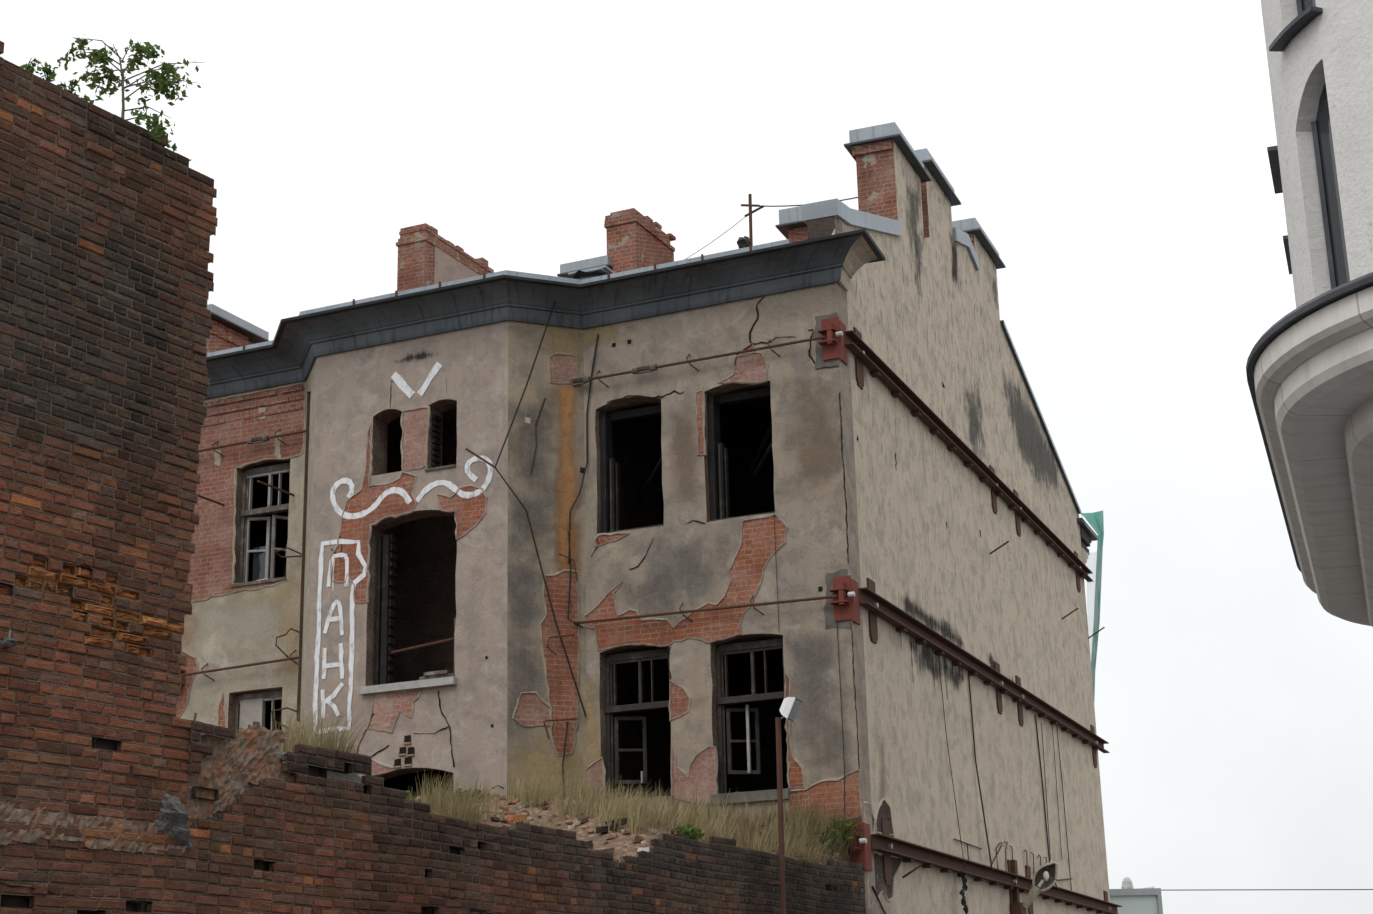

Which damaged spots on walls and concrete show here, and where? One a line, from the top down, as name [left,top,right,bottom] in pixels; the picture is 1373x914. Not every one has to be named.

peeling [694,343,769,456]
water stain [1005,383,1057,488]
spalling [0,548,423,854]
peeling [512,514,789,757]
water stain [900,598,964,699]
peeling [586,757,606,798]
crack [0,882,55,894]